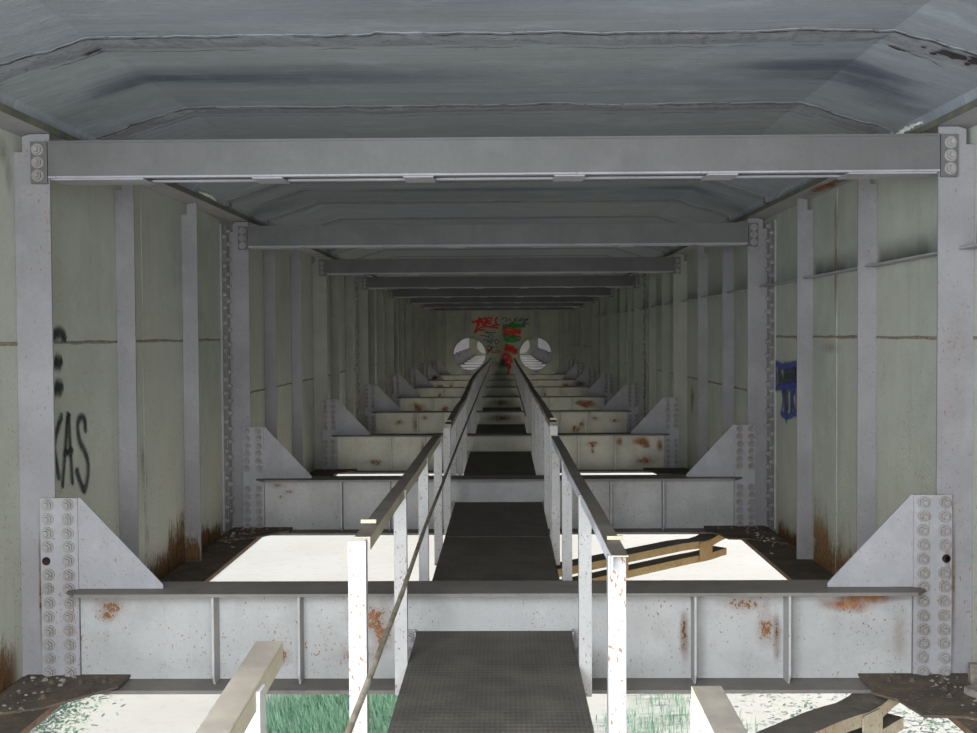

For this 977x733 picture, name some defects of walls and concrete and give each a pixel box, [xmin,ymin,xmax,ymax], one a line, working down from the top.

spalling [921,46,977,66]
corrosion [150,518,221,580]
corrosion [814,517,851,575]
corrosion [836,596,884,608]
corrosion [0,642,14,693]